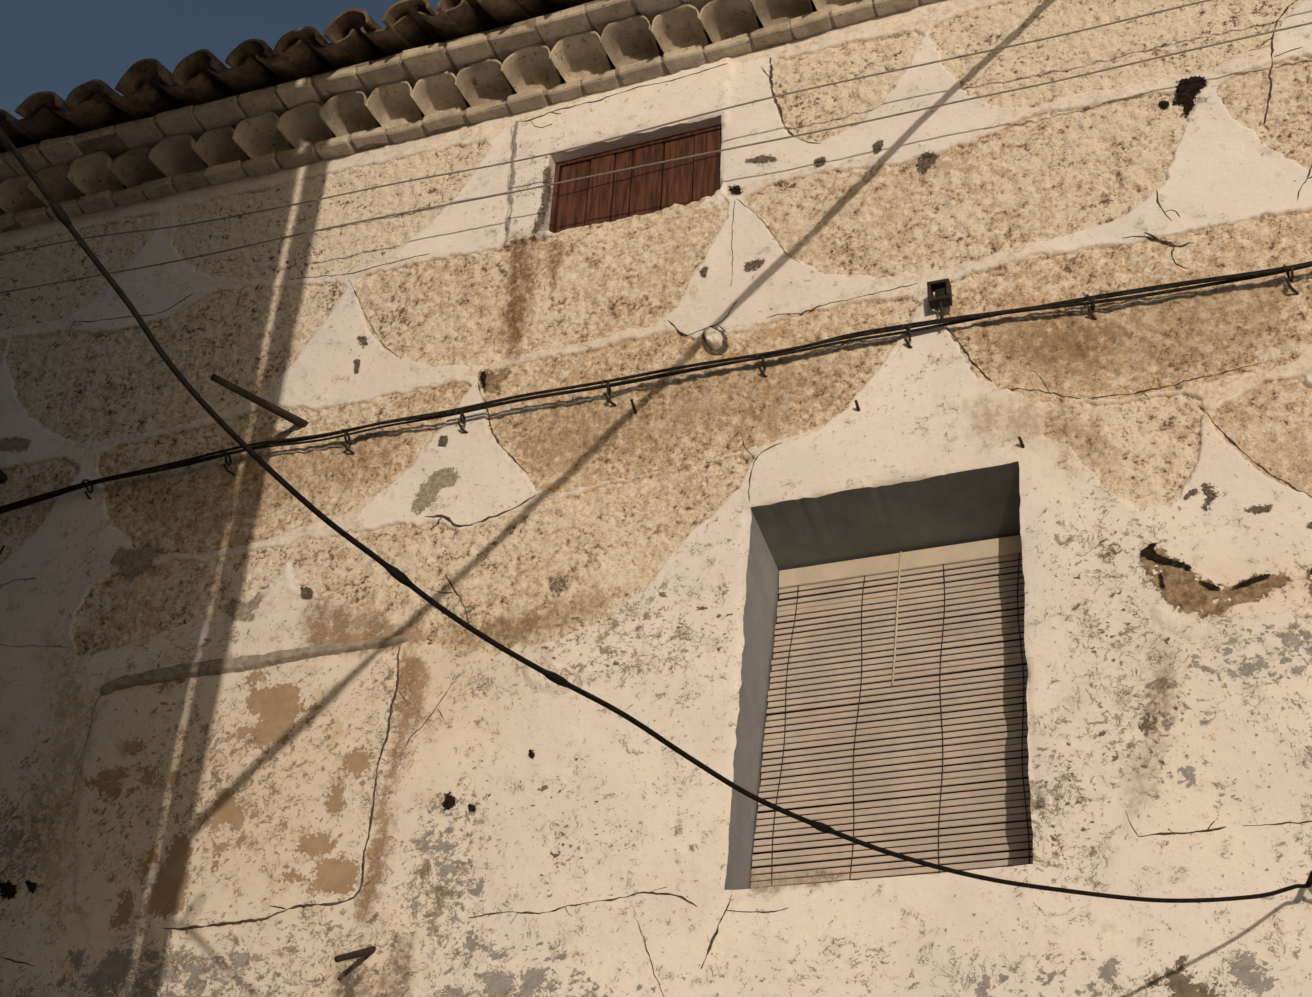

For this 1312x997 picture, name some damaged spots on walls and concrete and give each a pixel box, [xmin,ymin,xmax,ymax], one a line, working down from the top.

crack [1251,0,1302,125]
peeling [1191,624,1312,684]
peeling [0,788,55,902]
peeling [51,669,319,997]
crack [163,647,452,930]
peeling [1138,685,1214,789]
crack [1126,812,1312,837]
crack [469,887,787,997]